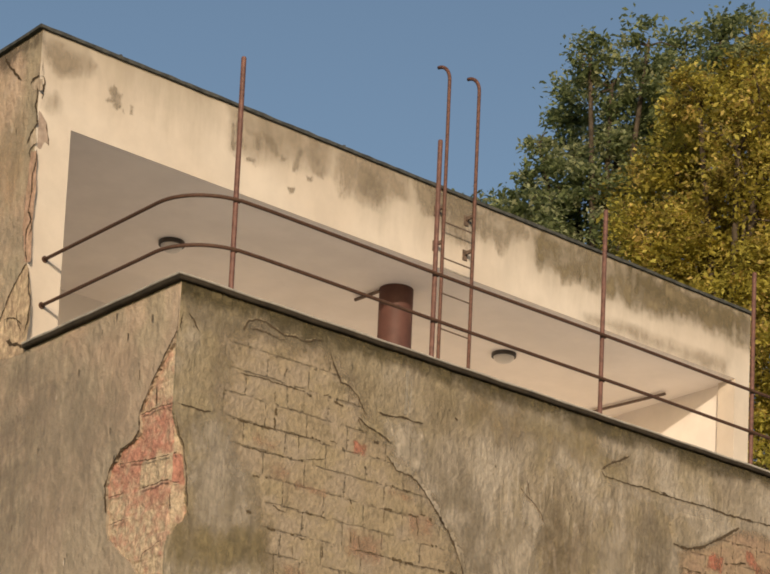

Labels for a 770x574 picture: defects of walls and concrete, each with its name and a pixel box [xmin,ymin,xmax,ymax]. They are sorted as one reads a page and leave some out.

crack [5,58,46,263]
damp [340,153,405,197]
damp [414,179,750,345]
flaking render [101,344,192,574]
peeling [215,323,465,574]
crack [601,456,770,526]
peeling [679,533,770,574]